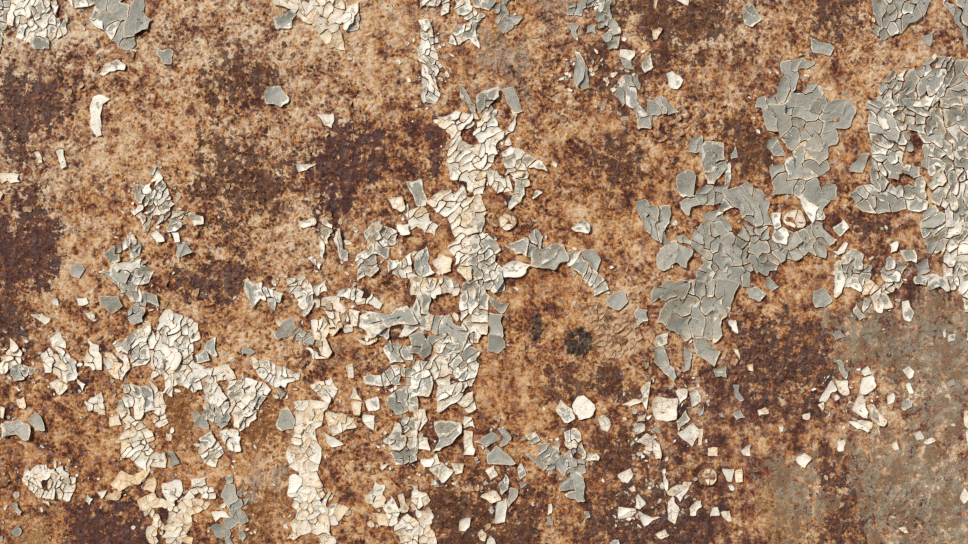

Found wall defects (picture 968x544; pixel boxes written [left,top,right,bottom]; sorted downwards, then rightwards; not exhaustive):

peeling [272,0,360,50]
peeling [417,0,523,104]
peeling [567,0,683,129]
rust [581,0,753,106]
peeling [743,2,762,27]
rust [0,59,79,347]
rust [167,42,453,313]
peeling [0,84,628,544]
rust [538,302,709,544]
rust [699,297,843,428]
peeling [618,31,968,544]
rust [399,449,543,544]